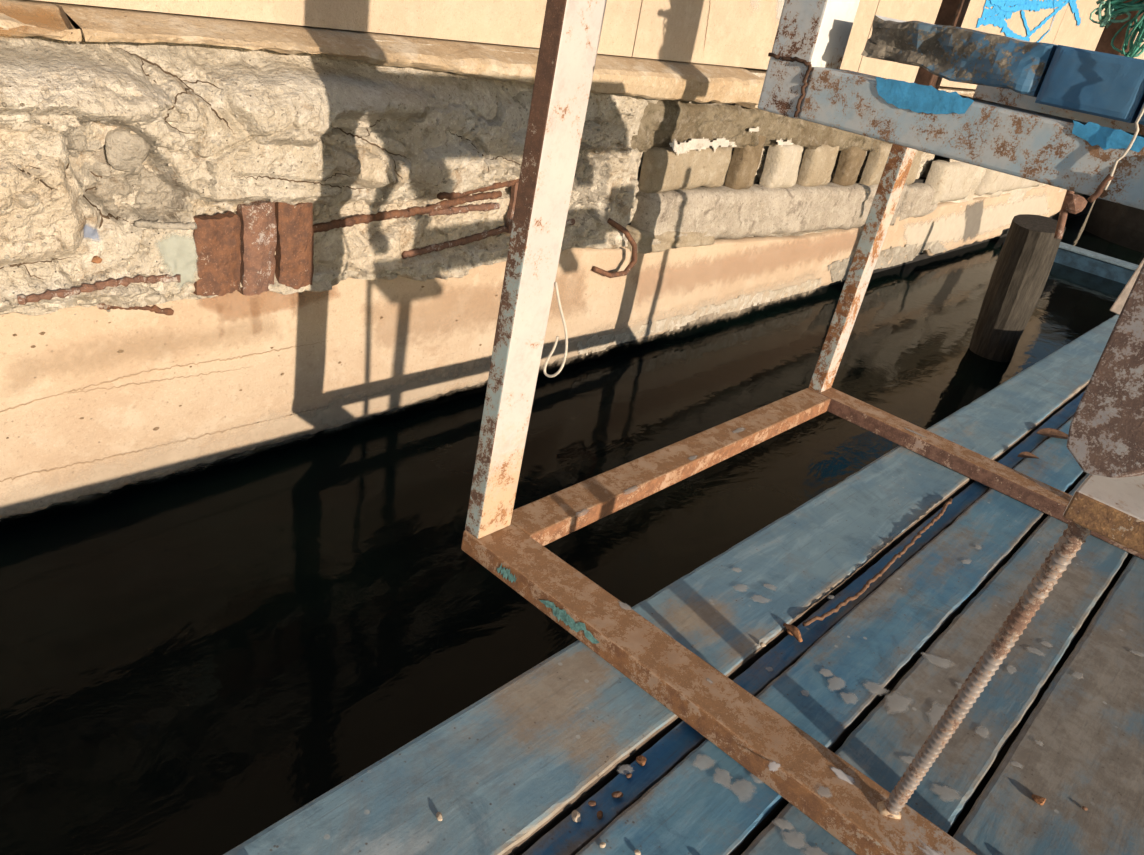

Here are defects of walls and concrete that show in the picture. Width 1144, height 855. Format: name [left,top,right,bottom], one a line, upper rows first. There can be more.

crack [60,6,76,34]
crack [114,46,233,134]
spalling [0,34,534,323]
spalling [560,92,659,253]
spalling [753,146,769,185]
spalling [856,150,870,183]
spalling [916,152,935,179]
spalling [874,240,948,270]
spalling [577,255,853,355]
crack [0,336,348,412]
crack [0,368,488,482]